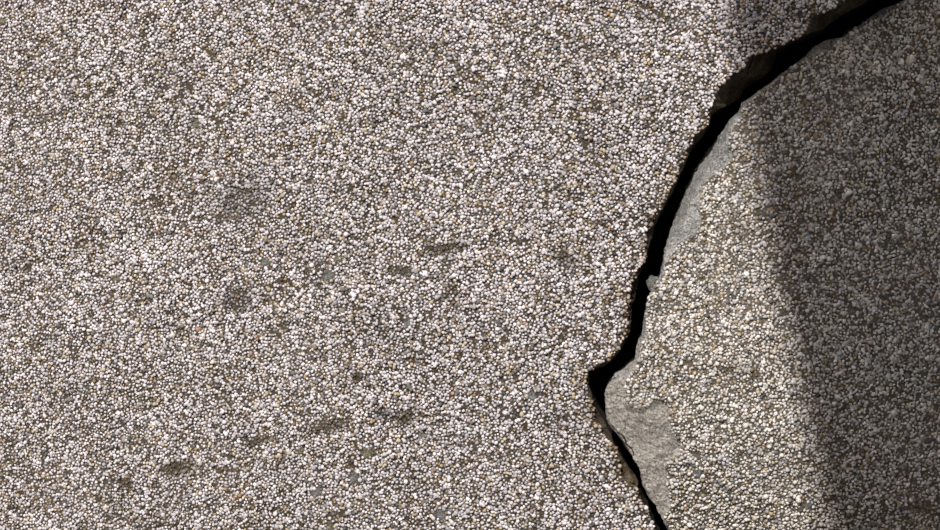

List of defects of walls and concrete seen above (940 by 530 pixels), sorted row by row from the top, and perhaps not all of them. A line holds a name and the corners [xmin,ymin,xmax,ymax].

spalling [604,338,682,525]
crack [586,0,905,530]